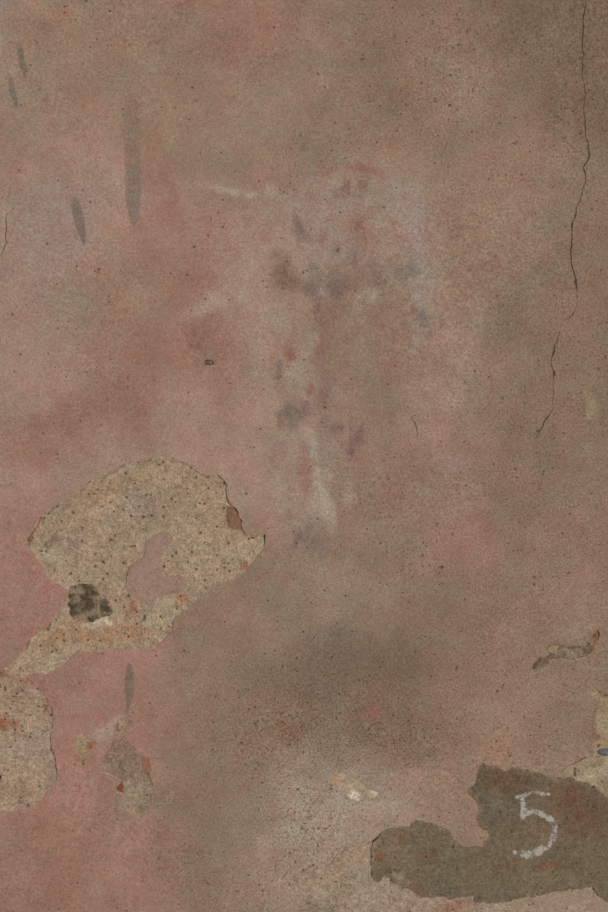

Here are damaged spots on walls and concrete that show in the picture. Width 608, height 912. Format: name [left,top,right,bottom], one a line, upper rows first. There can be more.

crack [535,2,591,438]
flaking render [0,455,266,819]
flaking render [532,630,600,674]
flaking render [328,773,380,802]
flaking render [554,689,608,797]
flaking render [254,837,608,912]